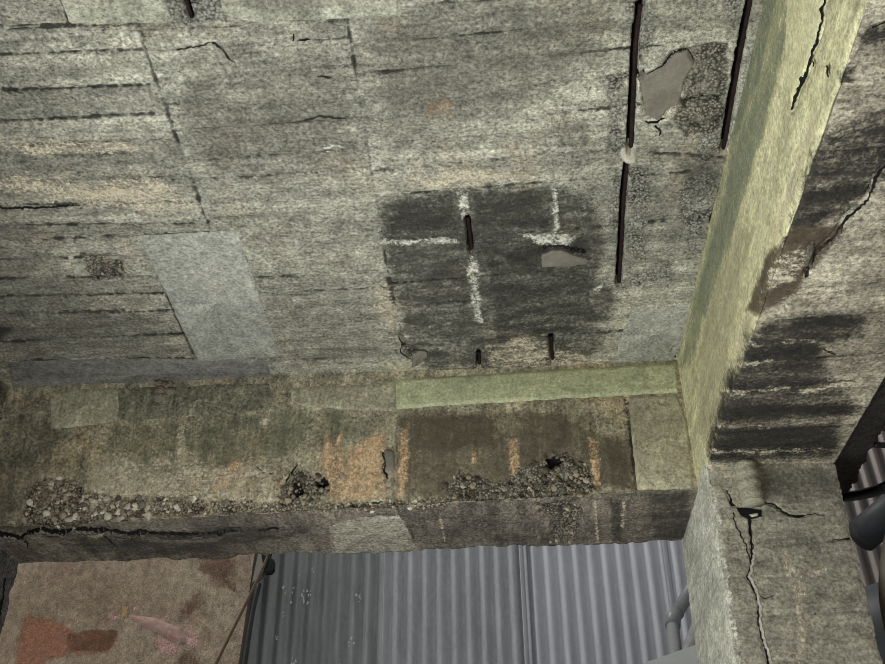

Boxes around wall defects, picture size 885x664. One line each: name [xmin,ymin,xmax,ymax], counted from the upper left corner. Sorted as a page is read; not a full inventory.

spalling [164,0,227,25]
crack [790,0,829,110]
spalling [606,0,753,291]
leakage [374,168,618,370]
spalling [505,243,590,267]
leakage [708,113,885,466]
crack [804,165,885,278]
crack [0,523,279,548]
spalling [22,452,597,544]
rust [322,433,386,503]
rust [397,428,410,498]
crack [726,490,774,664]